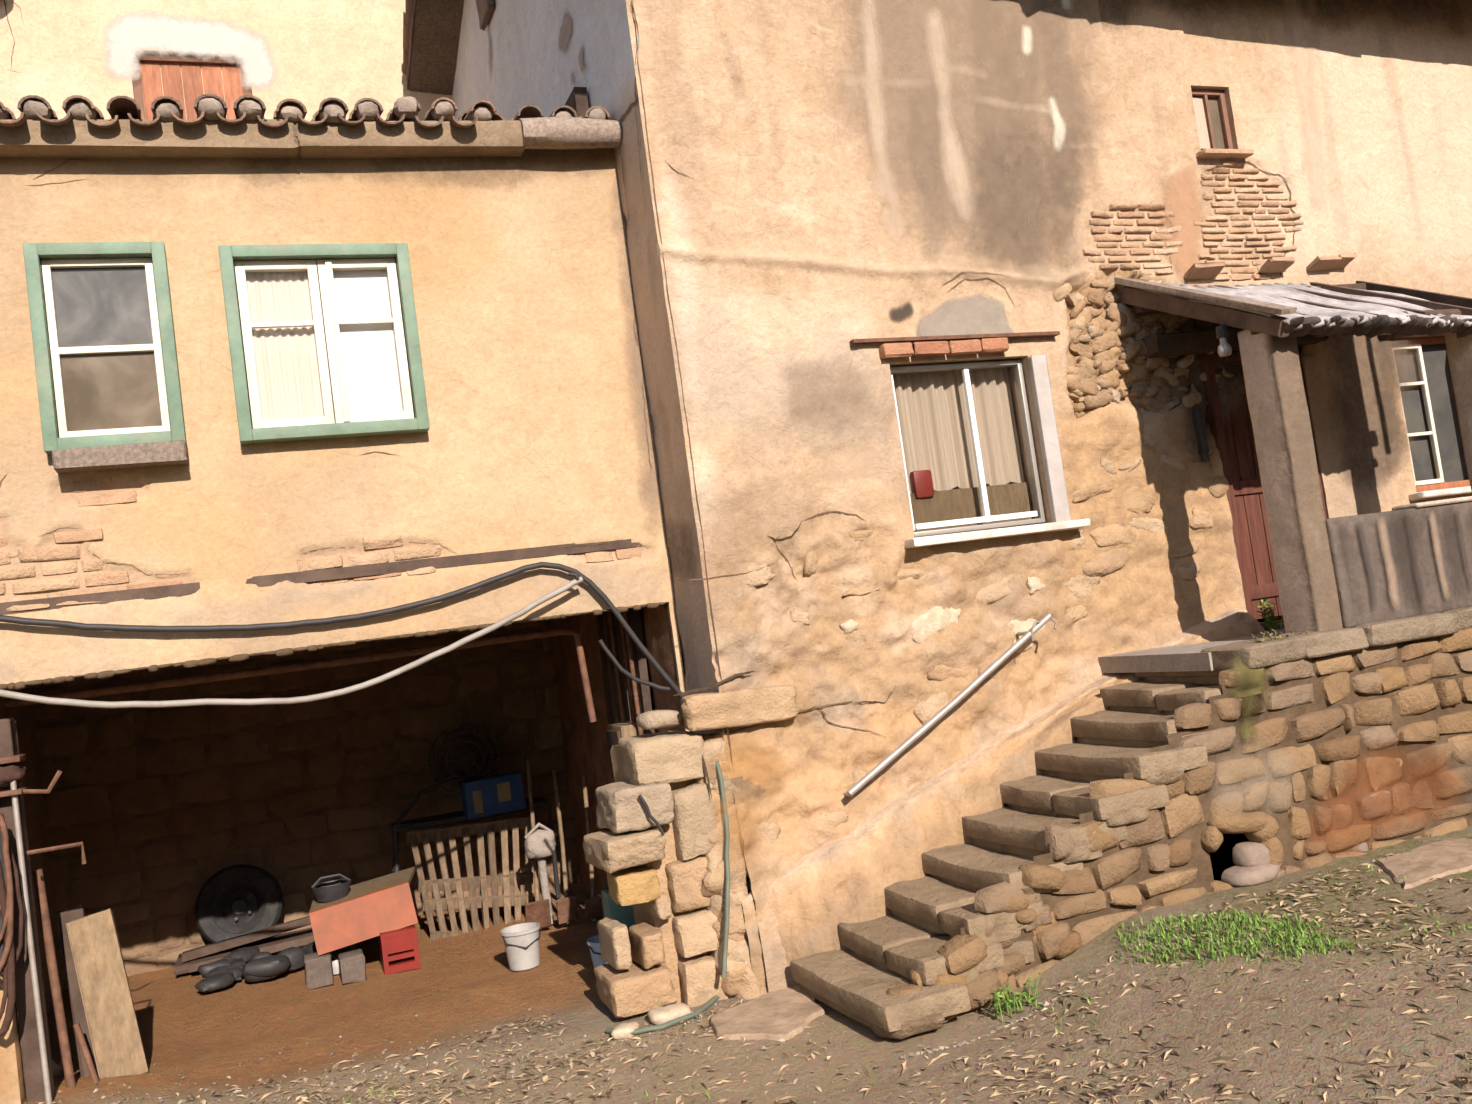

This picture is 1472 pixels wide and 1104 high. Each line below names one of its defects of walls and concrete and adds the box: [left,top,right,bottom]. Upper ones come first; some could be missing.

water stain [858,0,1126,269]
spalling [1052,161,1304,418]
spalling [1208,476,1229,498]
flaking render [0,528,183,612]
crack [673,511,864,582]
crack [673,671,754,696]
crack [798,688,895,737]
crack [702,723,762,798]